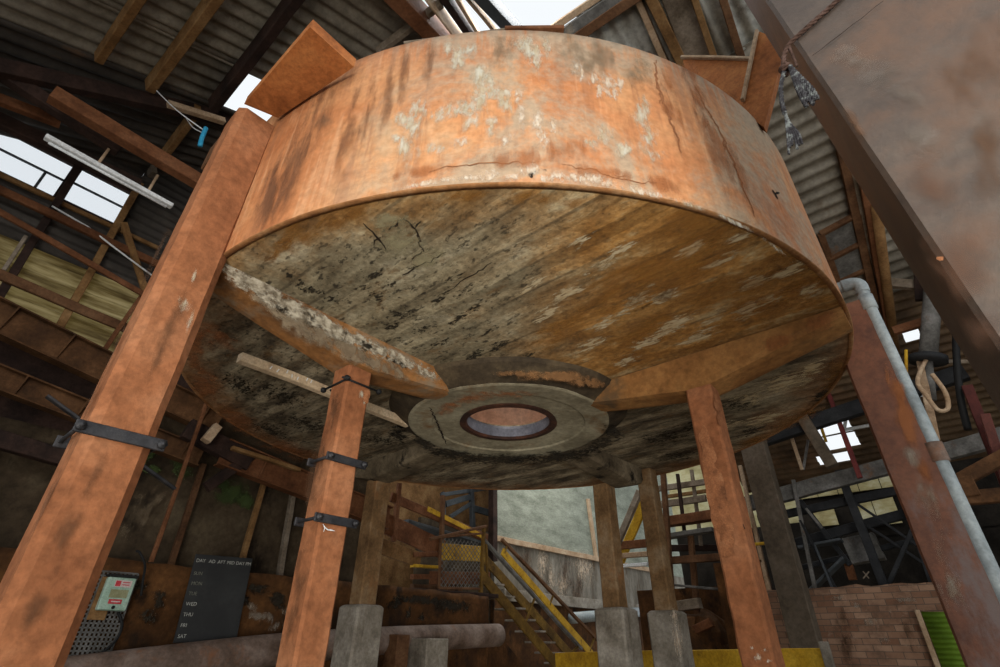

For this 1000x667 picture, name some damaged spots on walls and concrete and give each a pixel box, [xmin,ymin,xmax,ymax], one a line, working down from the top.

crack [653,60,682,153]
crack [430,161,535,172]
crack [564,164,662,184]
crack [695,87,755,217]
crack [363,218,441,275]
damp [286,272,339,304]
peeling [222,263,436,380]
damp [252,294,407,380]
damp [355,268,396,301]
damp [431,272,488,325]
damp [466,325,516,360]
corrosion [500,371,604,388]